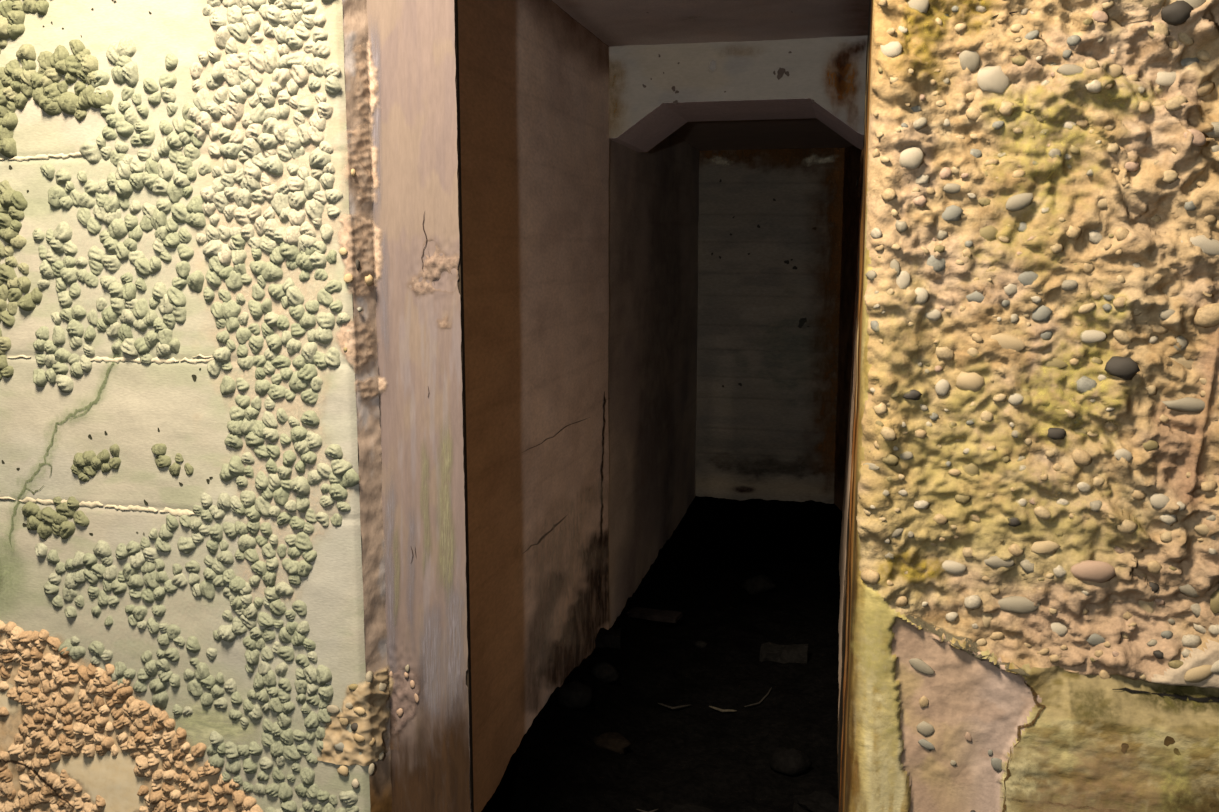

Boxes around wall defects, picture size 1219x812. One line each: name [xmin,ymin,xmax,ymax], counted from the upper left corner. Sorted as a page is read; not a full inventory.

corrosion [826,0,870,103]
crack [9,341,123,544]
spalling [856,0,1219,812]
crack [1112,687,1219,702]
crack [0,759,74,808]
water stain [1001,753,1059,812]